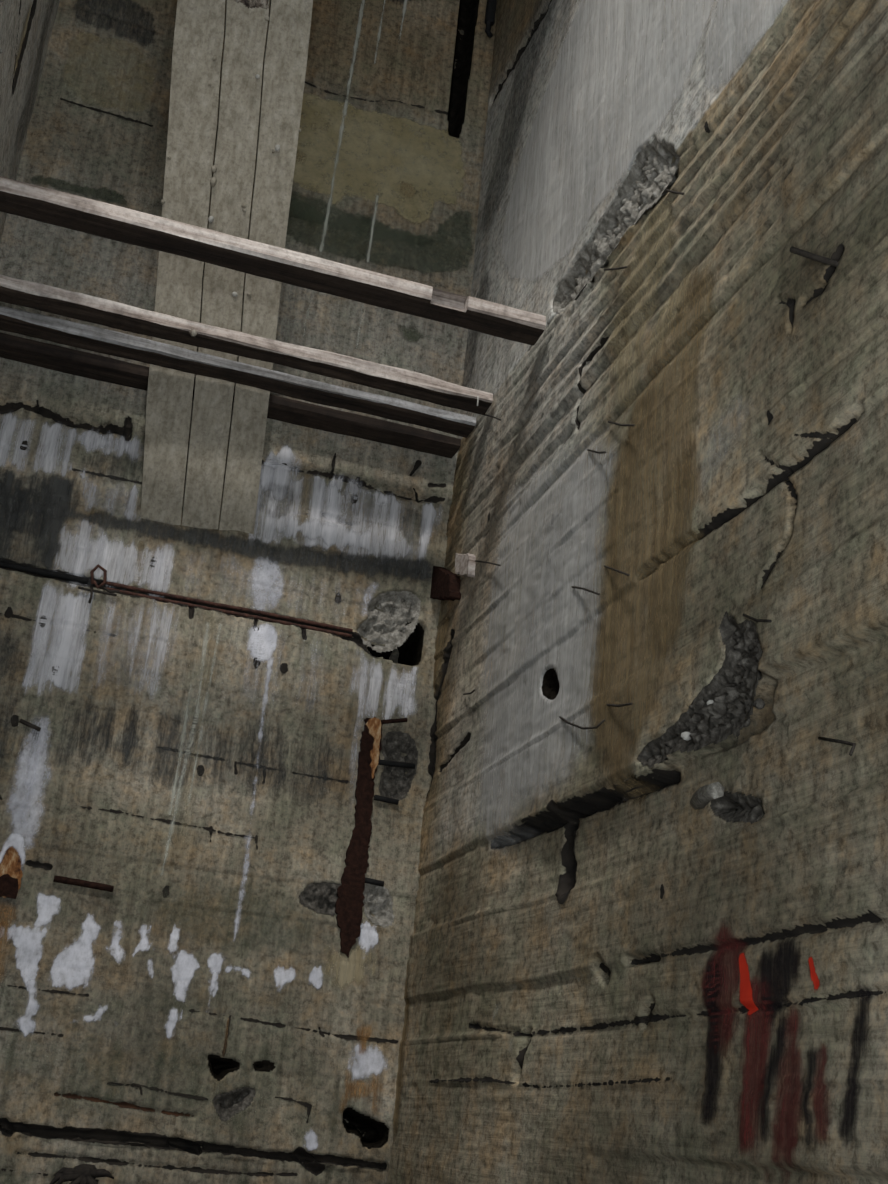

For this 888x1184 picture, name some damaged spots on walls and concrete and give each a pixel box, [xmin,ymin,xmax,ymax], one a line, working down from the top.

crack [0,400,133,441]
crack [0,558,377,658]
damp [0,412,436,703]
spalling [357,591,424,666]
spalling [637,611,765,768]
rust [326,717,415,988]
spalling [690,782,765,824]
damp [0,894,100,1036]
damp [166,927,250,1038]
damp [359,922,378,952]
crack [0,1082,387,1183]
spalling [207,1054,276,1122]